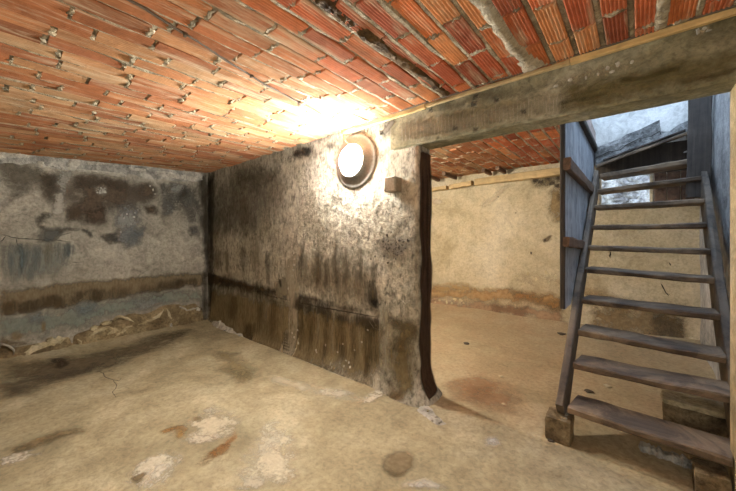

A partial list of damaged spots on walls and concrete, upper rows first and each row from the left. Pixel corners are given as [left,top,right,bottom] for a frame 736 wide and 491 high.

spalling [0,304,203,359]
water stain [0,163,417,403]
water stain [431,298,562,321]